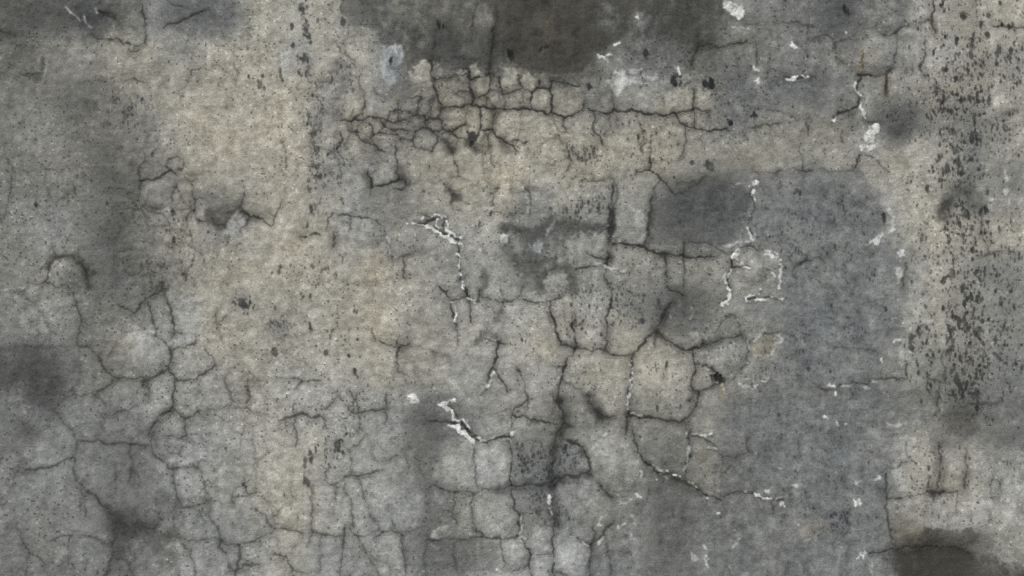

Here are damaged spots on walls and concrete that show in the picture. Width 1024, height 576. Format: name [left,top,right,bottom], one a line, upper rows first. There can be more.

crack [179,43,265,109]
crack [0,143,78,225]
crack [103,140,289,264]
crack [298,207,413,285]
crack [331,3,891,576]
water stain [358,0,1024,576]
crack [0,242,411,576]